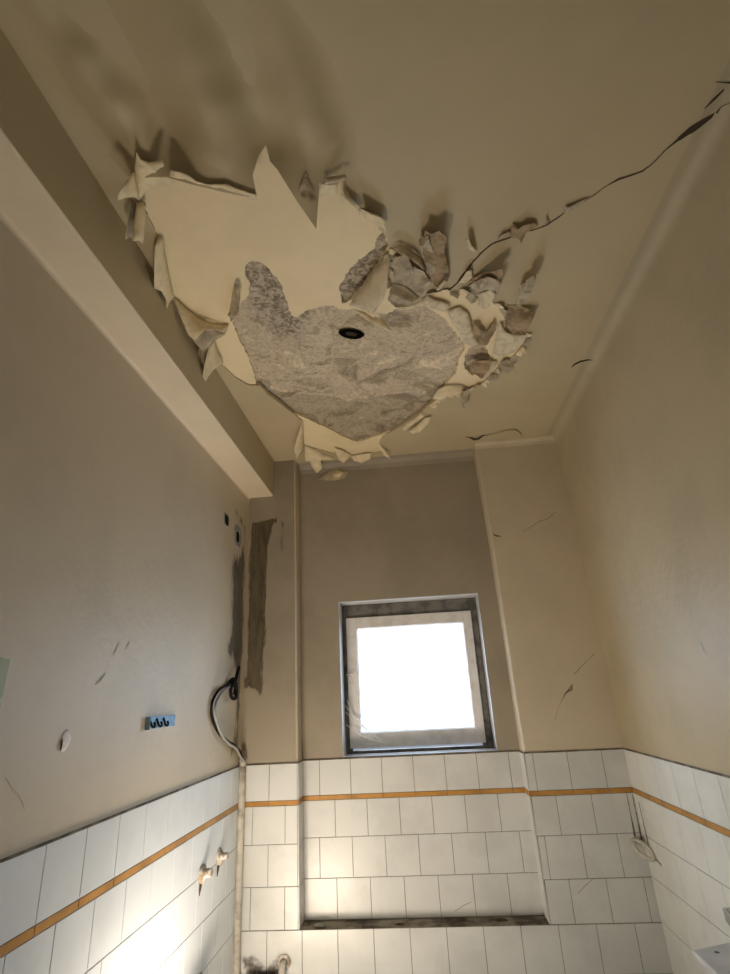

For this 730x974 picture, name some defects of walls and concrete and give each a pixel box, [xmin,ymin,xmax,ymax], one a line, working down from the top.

crack [440,81,730,292]
peeling [141,146,536,481]
crack [555,653,595,718]